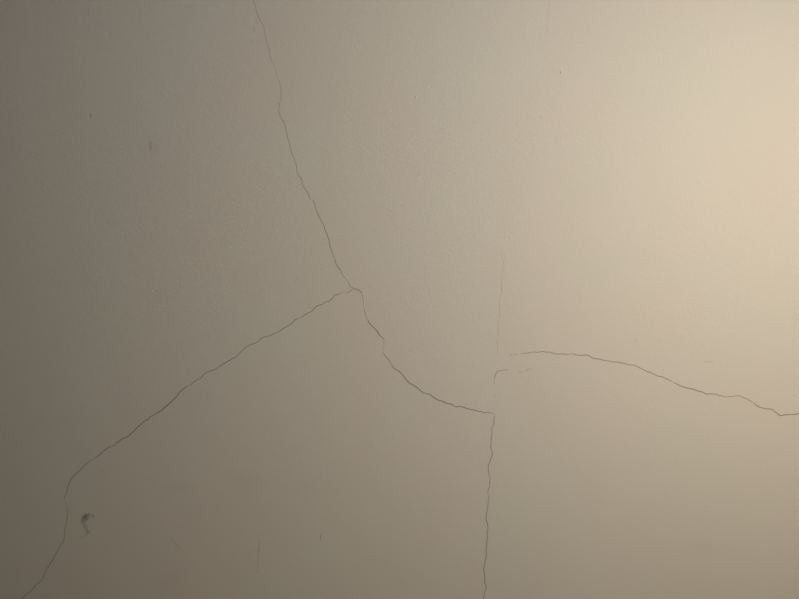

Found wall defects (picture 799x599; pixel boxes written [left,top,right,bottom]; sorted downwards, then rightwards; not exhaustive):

crack [23,1,495,599]
crack [494,253,799,417]